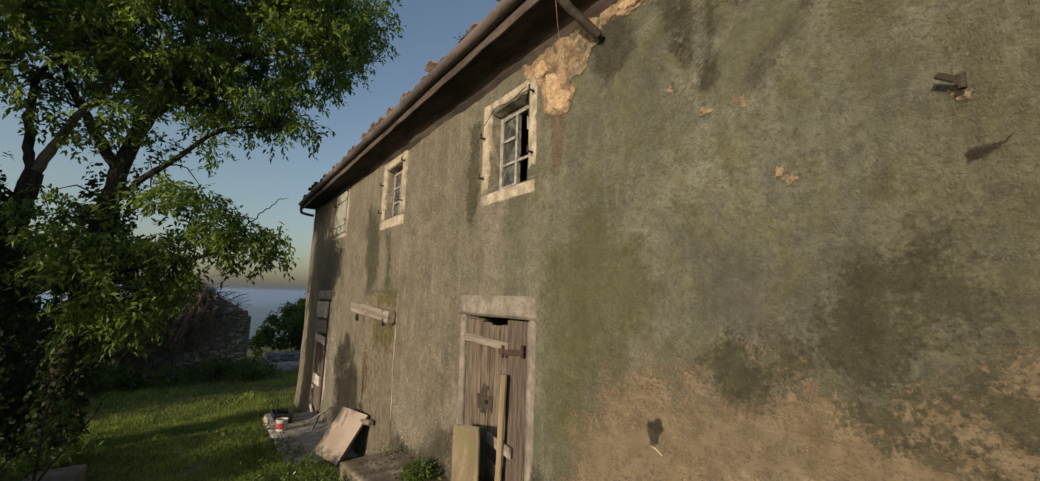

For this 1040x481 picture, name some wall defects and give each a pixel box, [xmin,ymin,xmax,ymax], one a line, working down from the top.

spalling [522,0,644,116]
leakage [595,16,633,78]
leakage [701,0,798,105]
leakage [466,122,482,222]
spalling [775,164,799,186]